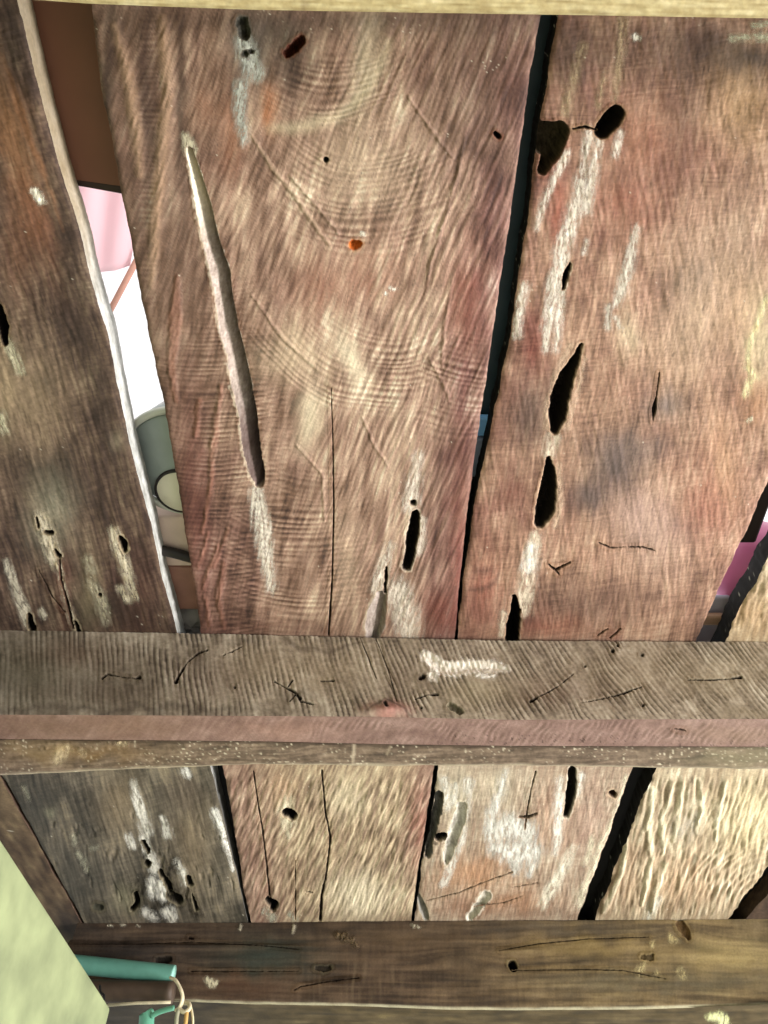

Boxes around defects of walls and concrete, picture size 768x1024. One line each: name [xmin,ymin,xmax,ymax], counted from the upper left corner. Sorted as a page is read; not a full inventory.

damp [512,283,525,337]
damp [543,131,600,384]
crack [324,384,443,704]
crack [595,539,659,555]
crack [525,670,646,707]
damp [125,781,174,923]
crack [68,767,363,994]
damp [212,809,234,869]
damp [485,771,541,876]
crack [515,767,541,834]
damp [543,778,571,908]
crack [495,933,670,983]